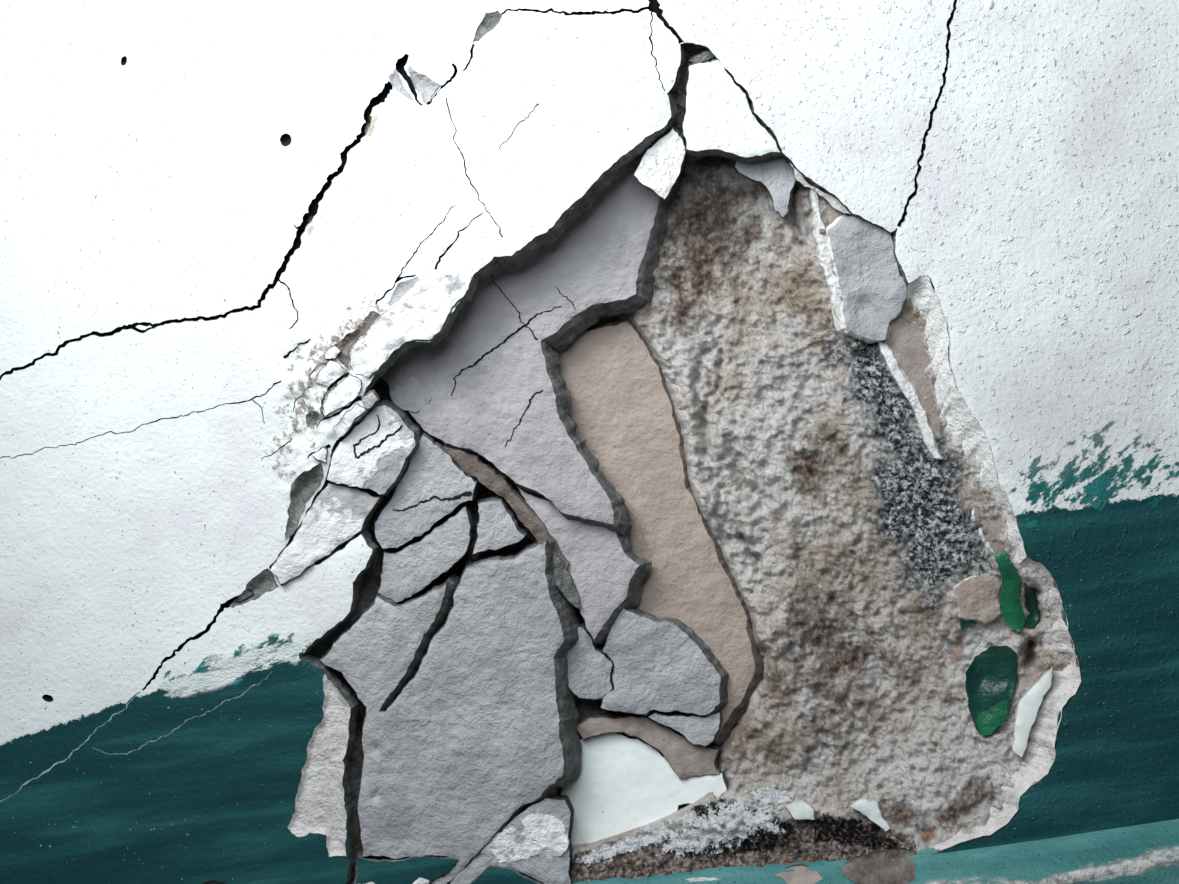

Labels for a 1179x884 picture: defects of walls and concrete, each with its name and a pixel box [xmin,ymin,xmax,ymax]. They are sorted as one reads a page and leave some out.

flaking render [280,134,291,146]
crack [499,103,539,149]
crack [502,0,683,91]
spalling [675,41,713,110]
crack [897,0,957,226]
crack [0,44,503,461]
flaking render [335,276,421,368]
peeling [160,490,403,698]
flaking render [285,462,324,540]
spalling [406,441,570,599]
spalling [556,155,1081,884]
peeling [287,668,366,857]